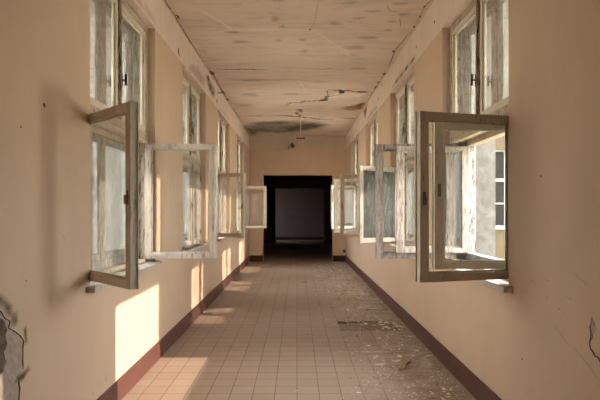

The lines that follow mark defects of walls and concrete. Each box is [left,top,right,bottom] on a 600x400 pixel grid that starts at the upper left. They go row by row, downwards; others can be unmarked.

crack [280,0,431,120]
damp [250,121,322,133]
flaking render [0,297,27,400]